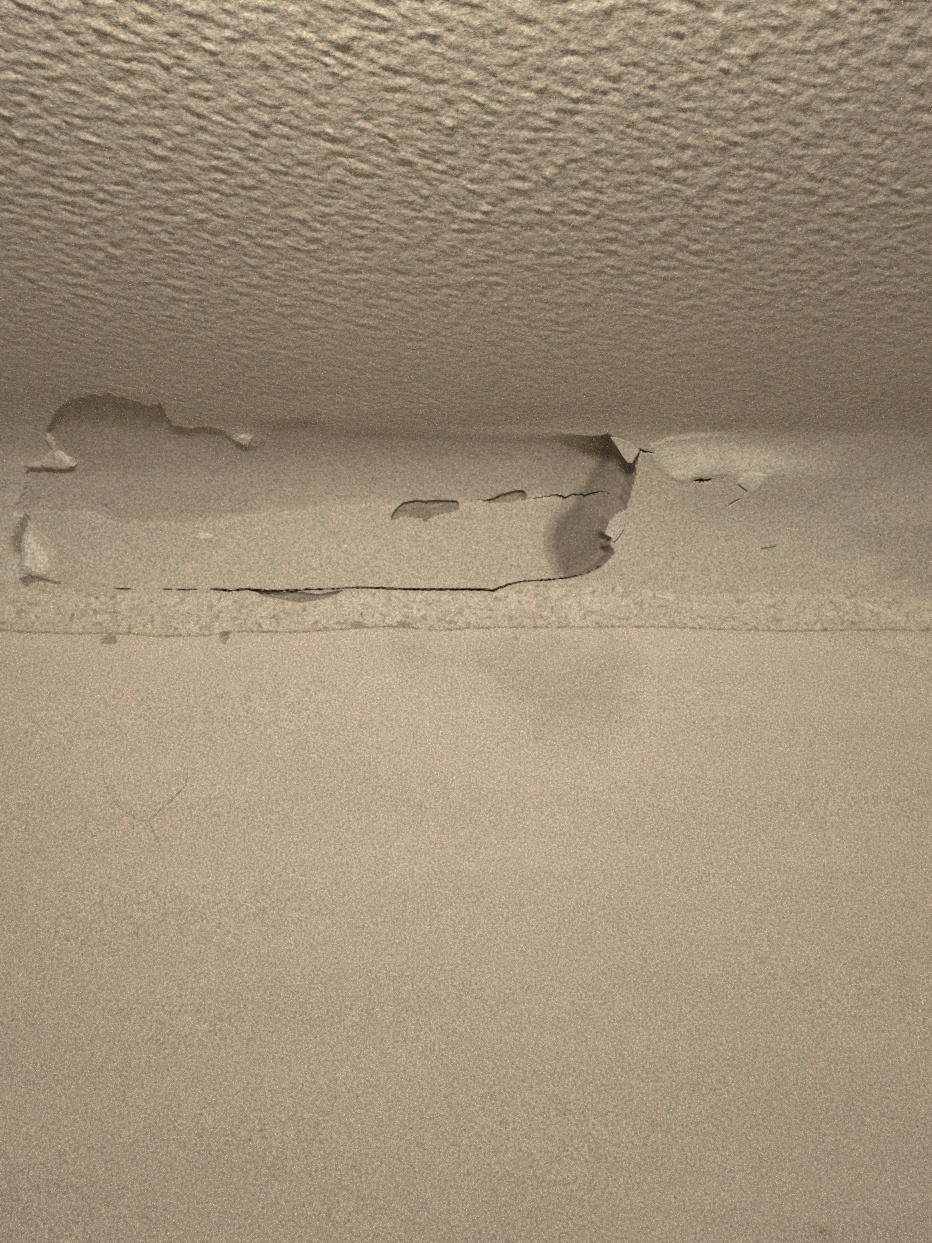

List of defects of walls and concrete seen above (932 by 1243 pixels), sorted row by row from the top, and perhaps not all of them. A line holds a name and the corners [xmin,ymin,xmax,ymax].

spalling [12,393,647,591]
crack [164,576,570,602]